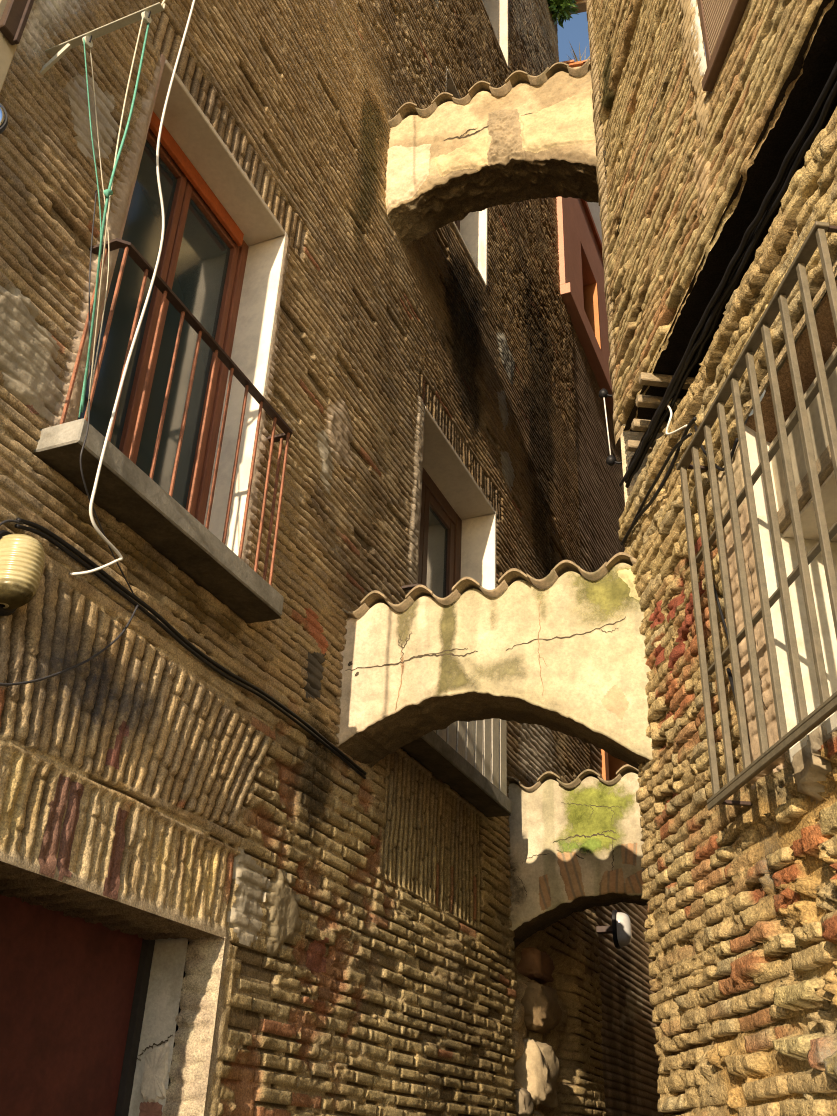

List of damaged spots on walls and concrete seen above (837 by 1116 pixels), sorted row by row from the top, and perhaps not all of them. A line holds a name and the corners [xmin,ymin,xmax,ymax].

crack [444,126,488,141]
crack [345,632,478,711]
crack [507,601,626,696]
flaking render [539,851,585,911]
flaking render [599,843,645,895]
crack [138,1035,173,1056]
flaking render [136,1041,170,1116]